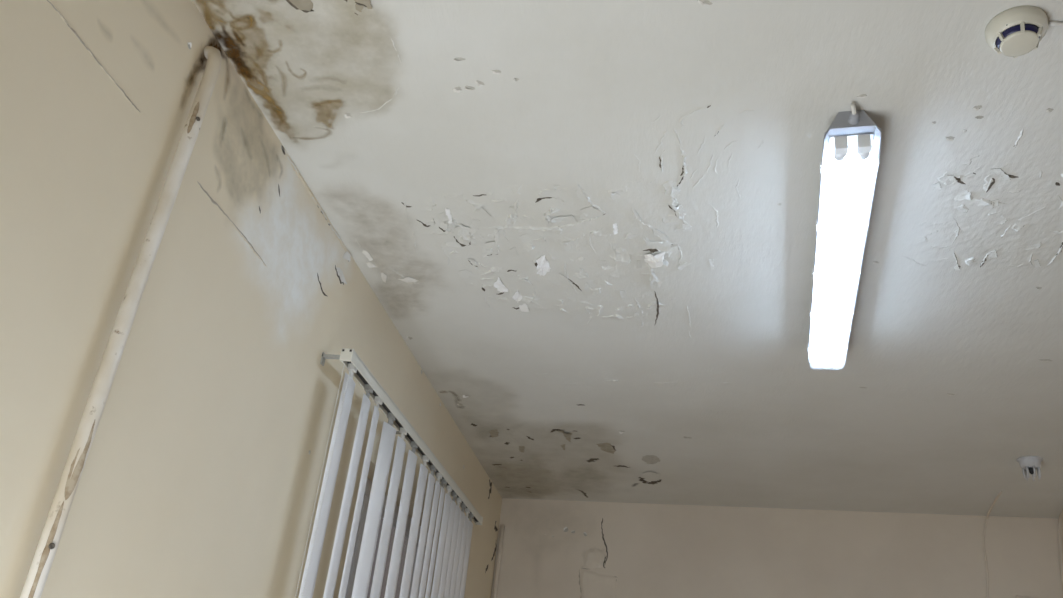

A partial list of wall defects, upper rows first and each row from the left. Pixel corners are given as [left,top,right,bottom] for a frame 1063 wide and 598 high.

damp [202,0,254,40]
peeling [401,103,738,338]
peeling [896,129,1063,272]
crack [579,518,617,598]